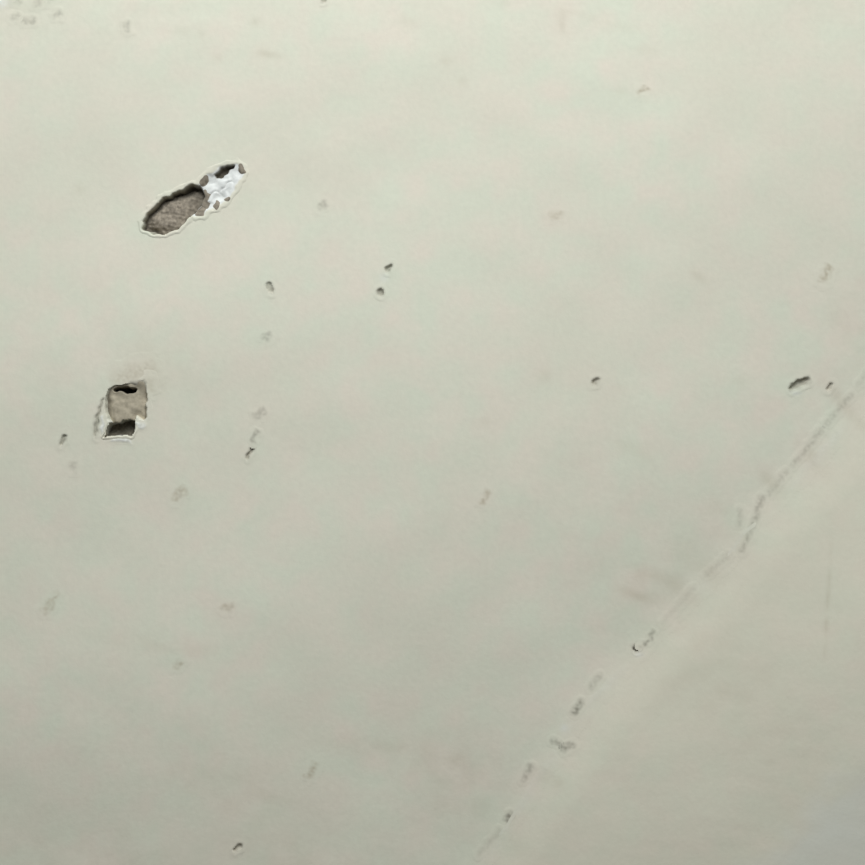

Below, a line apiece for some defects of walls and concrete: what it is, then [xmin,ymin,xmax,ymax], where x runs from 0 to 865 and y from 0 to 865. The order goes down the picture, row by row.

flaking render [137,158,249,238]
flaking render [88,350,168,447]